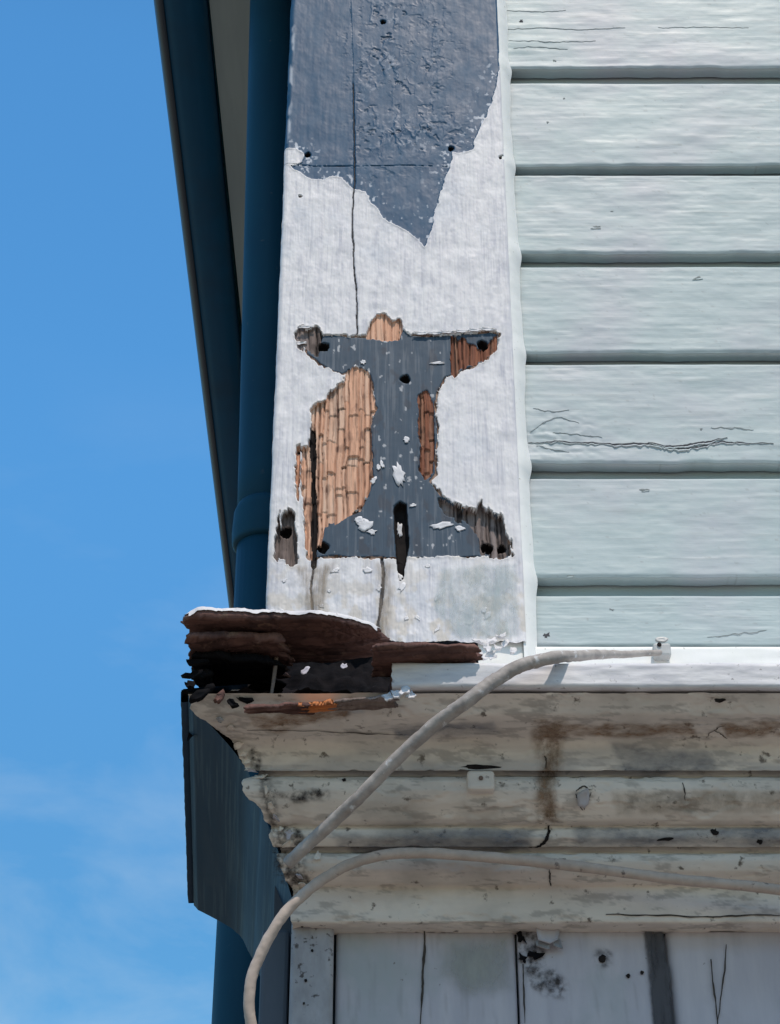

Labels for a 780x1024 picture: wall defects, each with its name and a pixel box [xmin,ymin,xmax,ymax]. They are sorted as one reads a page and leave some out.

peeling [285,0,500,247]
crack [336,84,358,335]
peeling [274,313,513,592]
crack [528,408,774,453]
water stain [264,796,310,887]
water stain [292,790,322,802]
crack [606,911,780,919]
water stain [527,968,563,991]